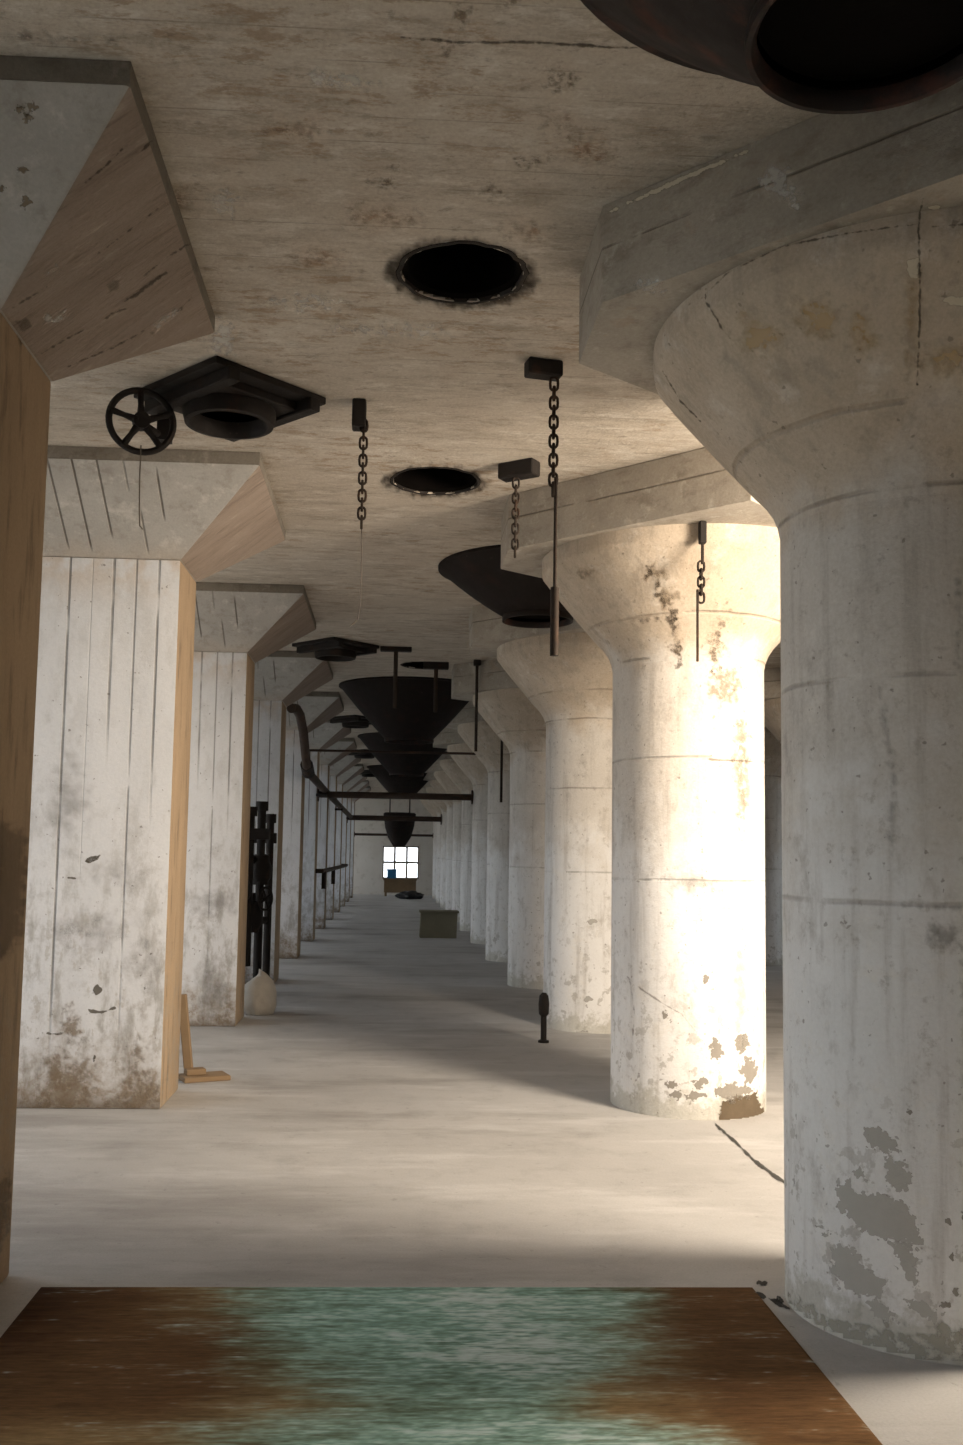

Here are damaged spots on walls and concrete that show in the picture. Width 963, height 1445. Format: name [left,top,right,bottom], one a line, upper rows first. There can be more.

peeling [664,1034,764,1120]
peeling [815,1126,959,1324]